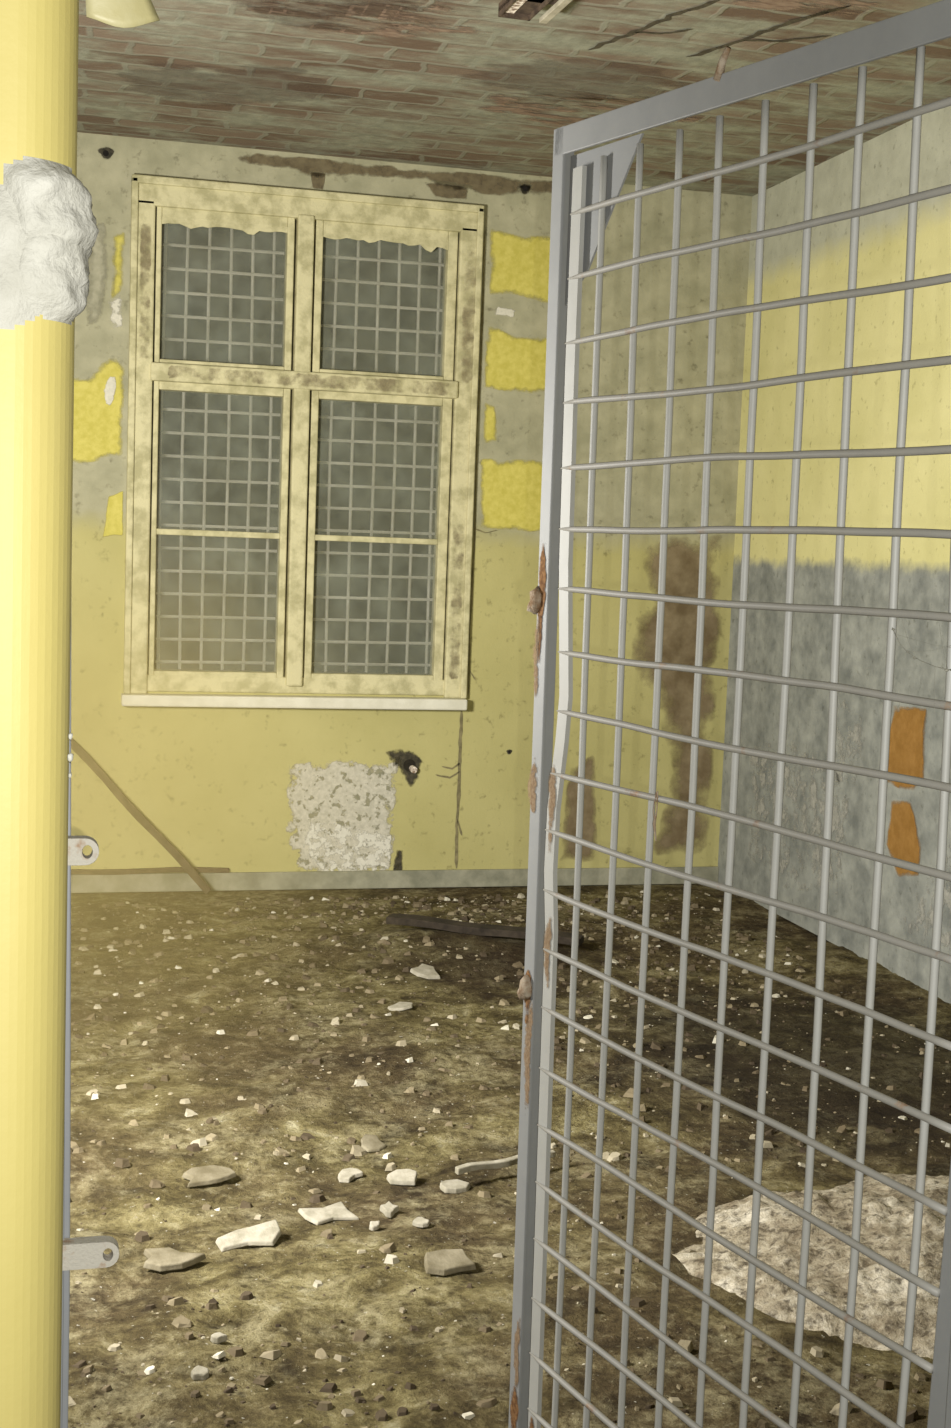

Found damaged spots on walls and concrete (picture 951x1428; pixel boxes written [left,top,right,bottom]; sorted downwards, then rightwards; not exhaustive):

peeling [86,0,160,28]
peeling [462,232,550,392]
peeling [73,361,123,462]
peeling [484,405,496,441]
peeling [103,491,123,537]
peeling [481,459,542,531]
peeling [286,750,422,871]